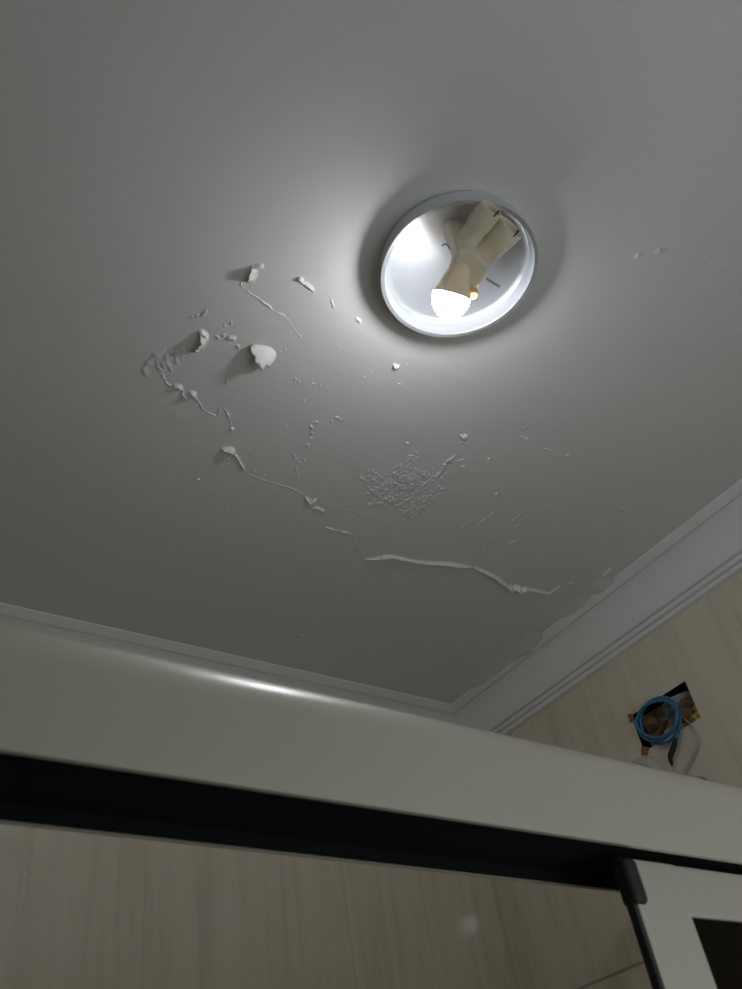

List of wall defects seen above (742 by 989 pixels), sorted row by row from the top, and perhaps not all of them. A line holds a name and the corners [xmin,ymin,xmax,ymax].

peeling [240,262,303,341]
peeling [140,309,276,381]
peeling [221,446,326,512]